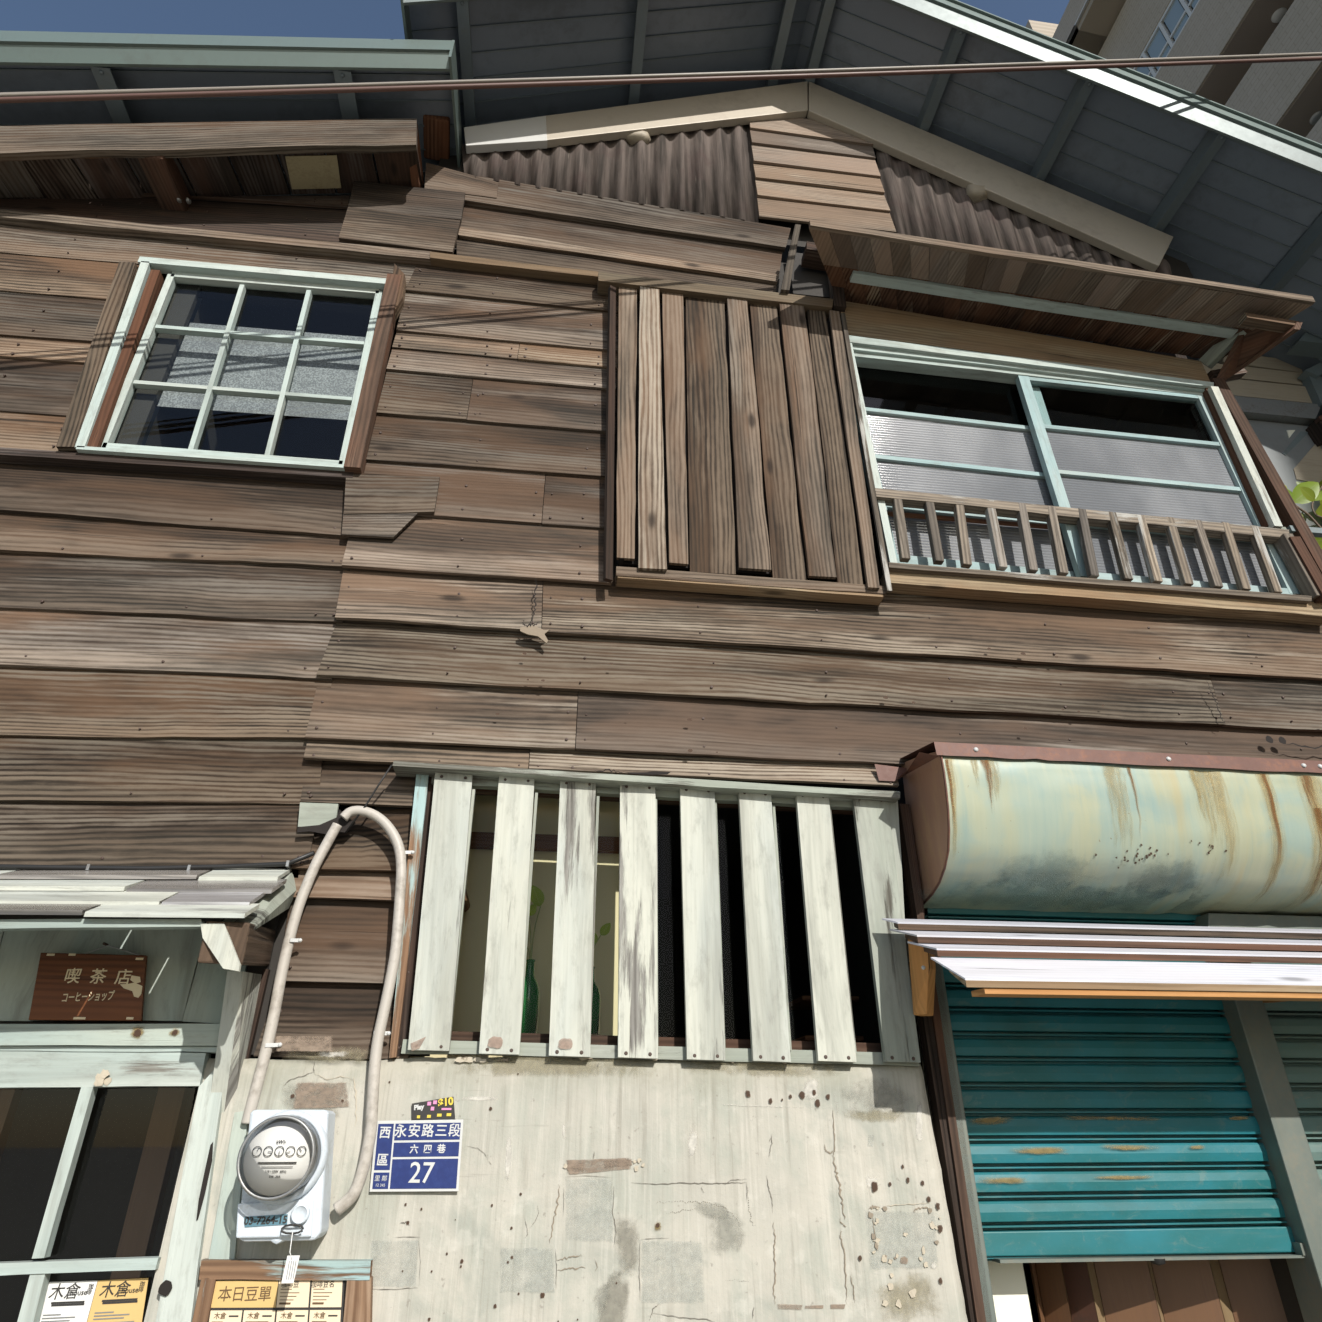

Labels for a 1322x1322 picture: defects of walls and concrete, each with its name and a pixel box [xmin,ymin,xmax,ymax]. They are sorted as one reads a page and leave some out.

rust [945,759,955,813]
rust [981,760,992,799]
rust [1261,774,1281,859]
rust [1302,775,1322,844]
crack [632,1137,776,1316]
crack [824,1117,855,1303]
peeling [868,1203,941,1310]
crack [649,1305,715,1322]